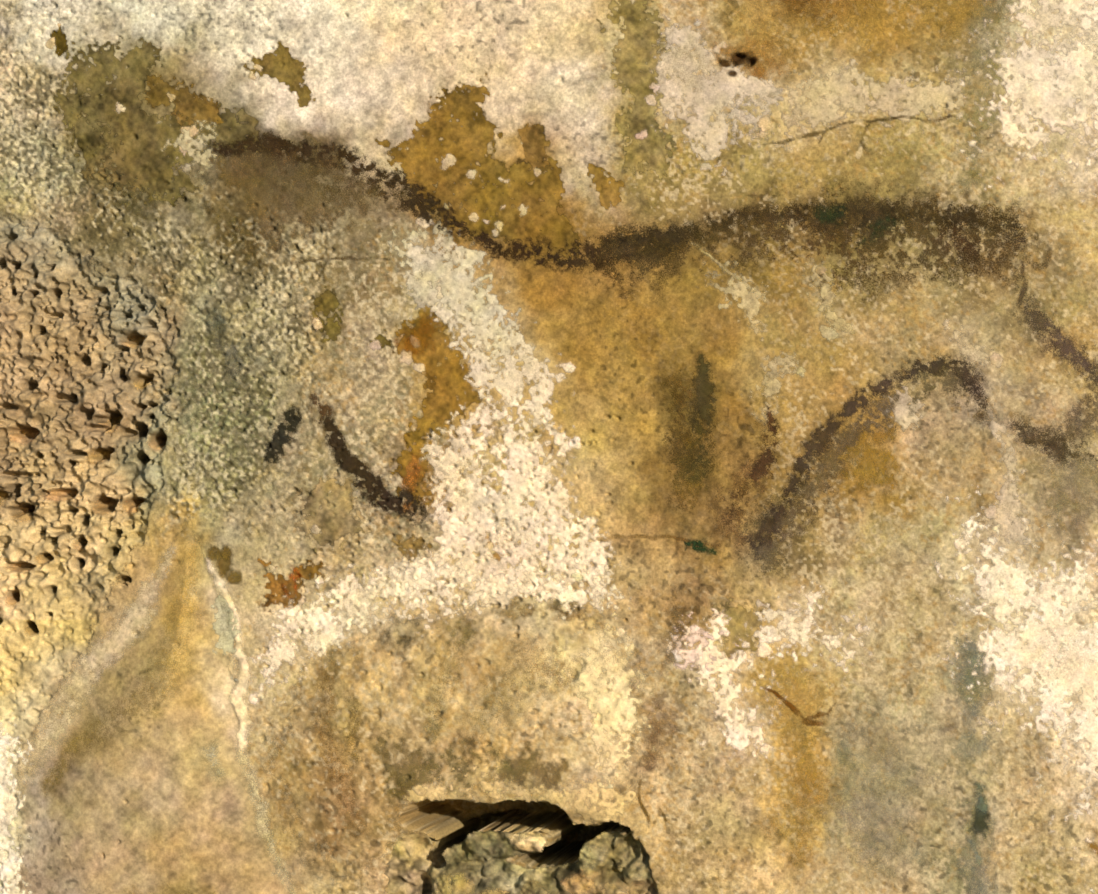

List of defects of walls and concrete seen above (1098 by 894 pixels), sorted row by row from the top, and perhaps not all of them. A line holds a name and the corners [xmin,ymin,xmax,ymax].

crack [778,115,952,148]
spalling [384,823,658,894]